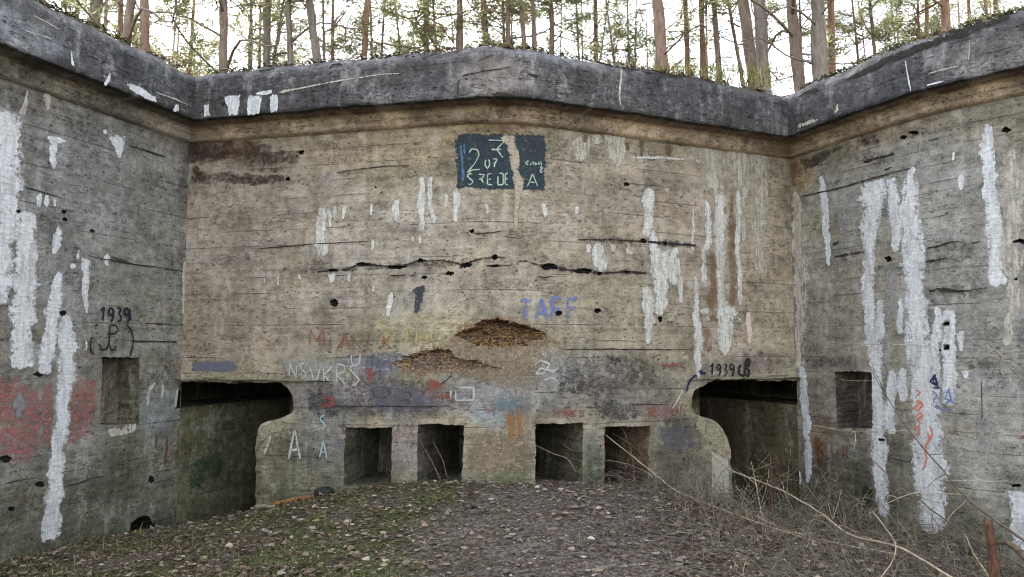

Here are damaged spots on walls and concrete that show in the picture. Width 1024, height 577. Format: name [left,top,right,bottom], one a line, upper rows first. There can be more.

leakage [189,141,299,186]
crack [257,231,646,278]
spalling [278,317,730,501]